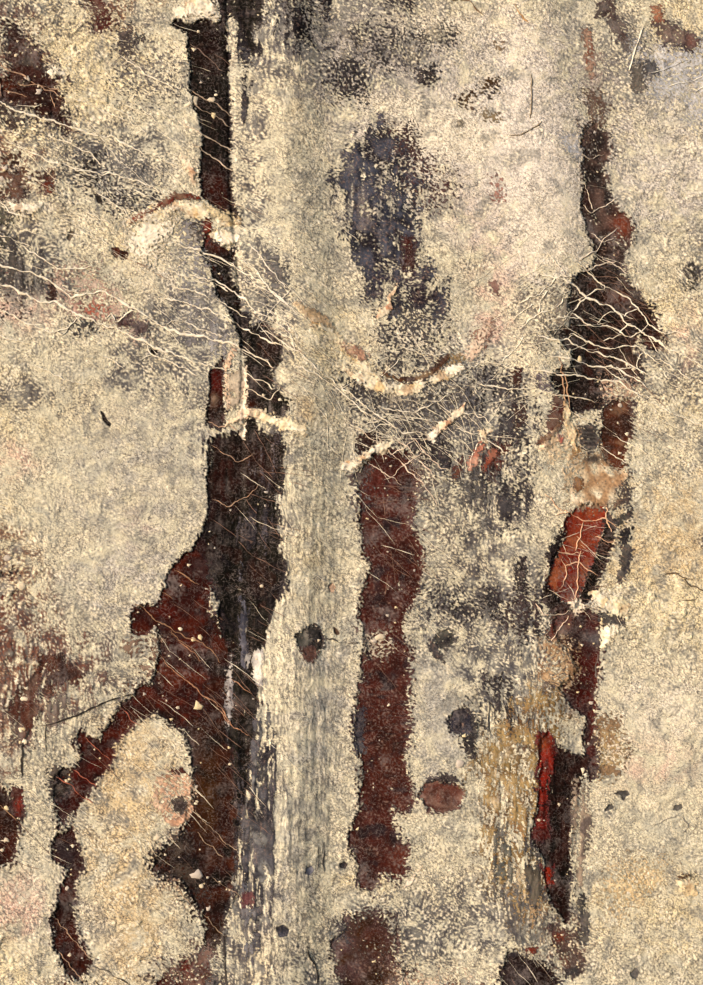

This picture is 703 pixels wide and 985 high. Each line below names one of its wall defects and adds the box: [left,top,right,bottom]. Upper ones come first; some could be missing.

crack [0,20,703,664]
leakage [210,0,544,545]
rust [544,393,570,435]
rust [598,393,638,584]
rust [0,543,242,985]
crack [0,570,310,985]
rust [325,444,485,985]
crack [482,952,553,984]